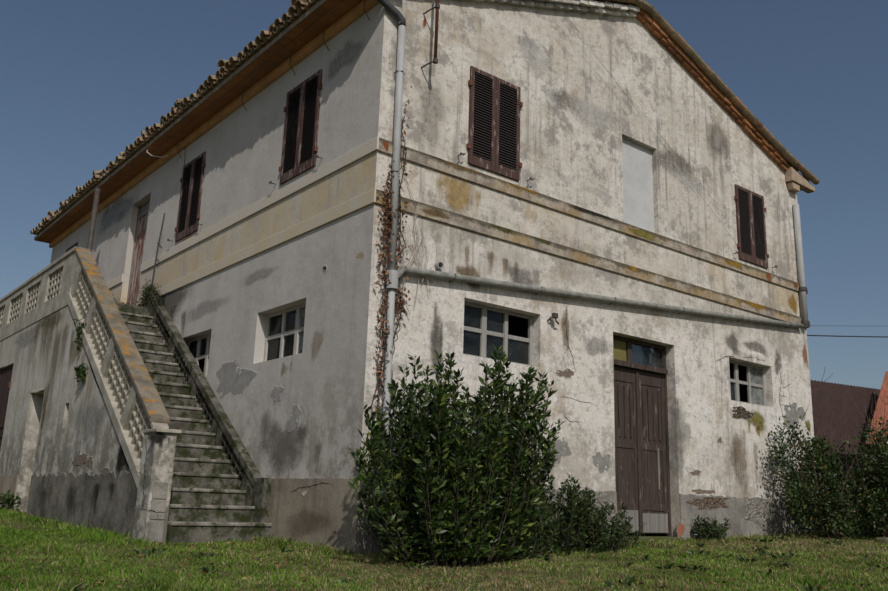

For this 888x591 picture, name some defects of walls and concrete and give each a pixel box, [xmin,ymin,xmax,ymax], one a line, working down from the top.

water stain [458,249,479,288]
water stain [18,309,83,429]
spalling [732,405,754,420]
peeling [783,402,806,429]
spalling [686,489,729,510]